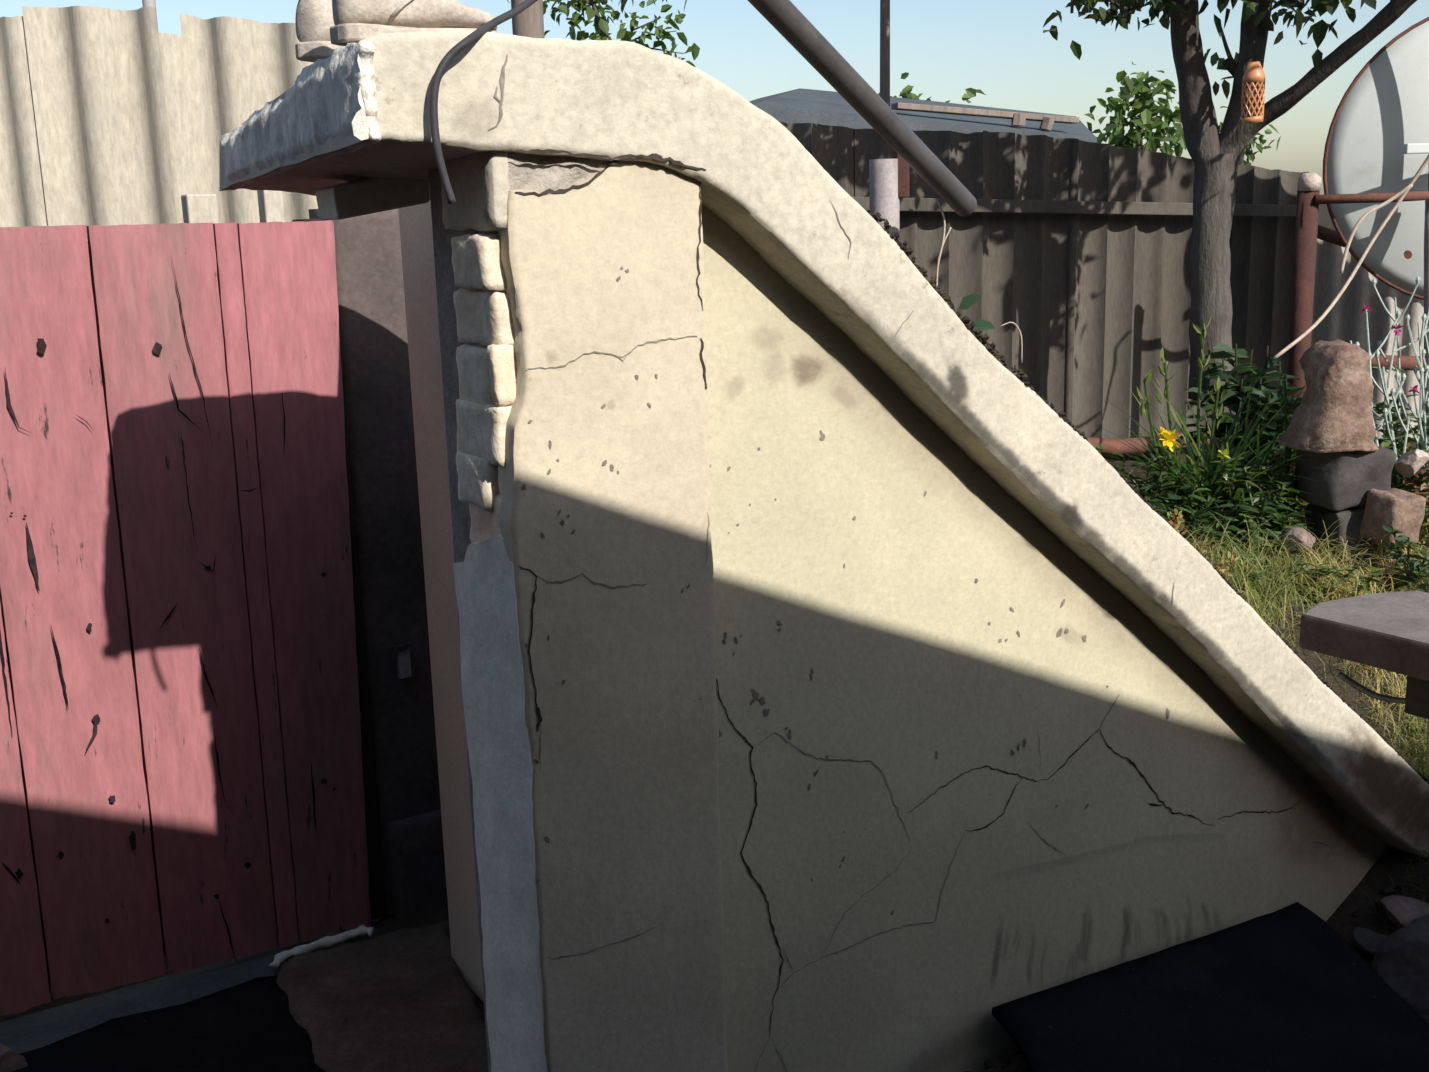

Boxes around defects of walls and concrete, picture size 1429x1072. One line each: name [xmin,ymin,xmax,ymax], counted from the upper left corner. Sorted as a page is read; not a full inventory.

crack [488,55,707,389]
crack [517,565,647,769]
crack [716,678,1302,1072]